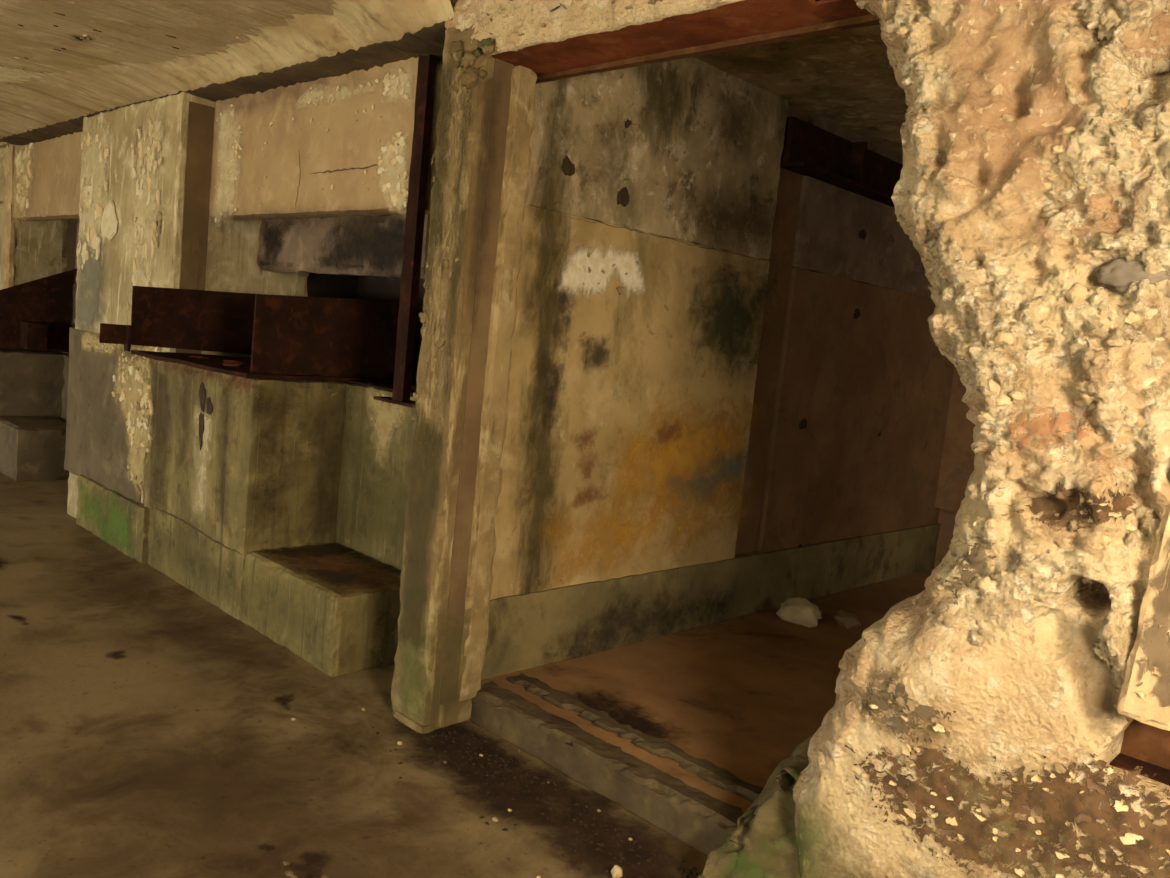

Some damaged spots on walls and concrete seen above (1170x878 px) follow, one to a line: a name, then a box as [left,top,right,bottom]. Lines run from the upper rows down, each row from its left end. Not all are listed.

peeling [76,126,118,270]
peeling [131,117,163,287]
water stain [260,221,291,271]
water stain [320,216,406,279]
peeling [82,333,160,495]
water stain [544,364,560,421]
water stain [585,340,609,366]
water stain [693,267,768,374]
spalling [886,0,1170,722]
peeling [845,653,1170,878]